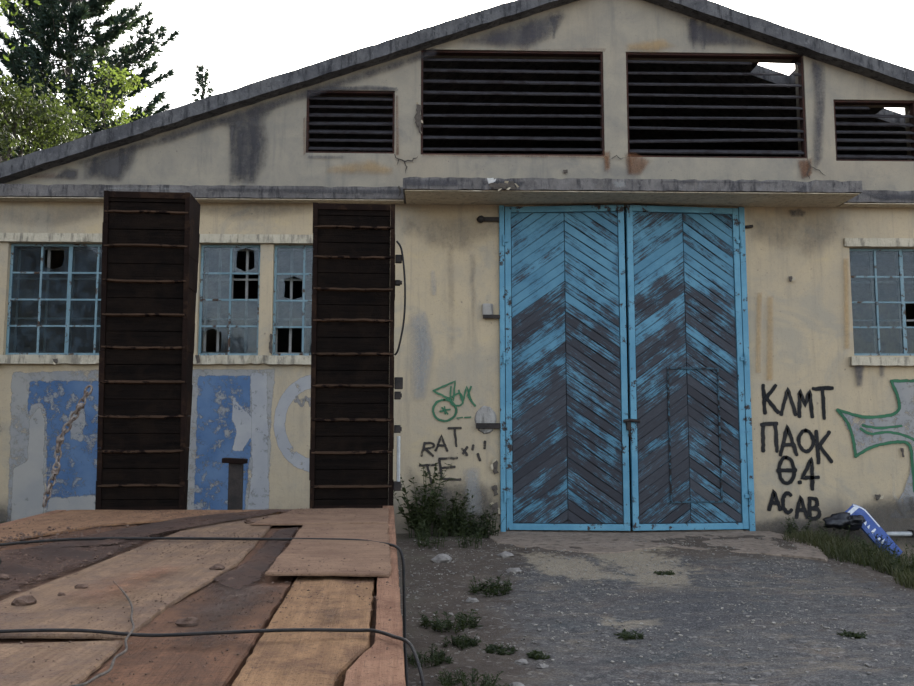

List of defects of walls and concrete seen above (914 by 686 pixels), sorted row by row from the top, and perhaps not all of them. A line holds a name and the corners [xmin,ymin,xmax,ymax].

water stain [689,19,750,46]
water stain [89,53,432,179]
crack [394,154,418,197]